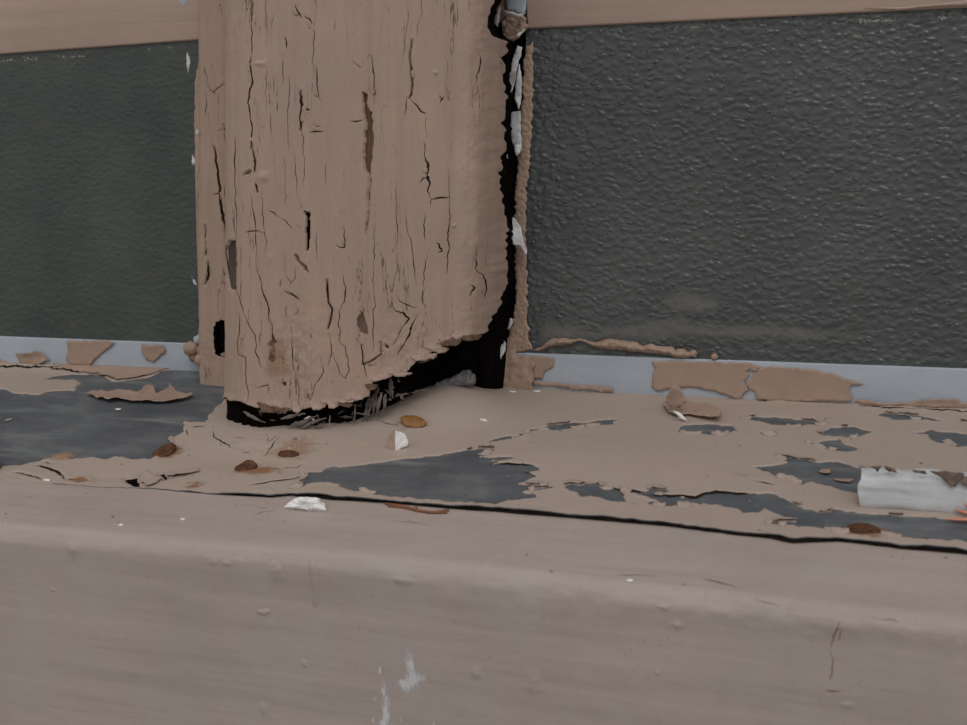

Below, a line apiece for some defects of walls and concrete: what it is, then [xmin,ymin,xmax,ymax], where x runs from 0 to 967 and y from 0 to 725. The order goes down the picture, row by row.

peeling [494,7,525,158]
crack [204,1,326,394]
crack [311,6,451,398]
crack [469,247,487,297]
peeling [511,218,527,255]
peeling [0,340,226,485]
peeling [284,419,618,511]
peeling [527,356,613,393]
peeling [564,479,967,542]
peeling [651,361,967,493]
damp [372,667,402,725]
damp [398,651,426,693]